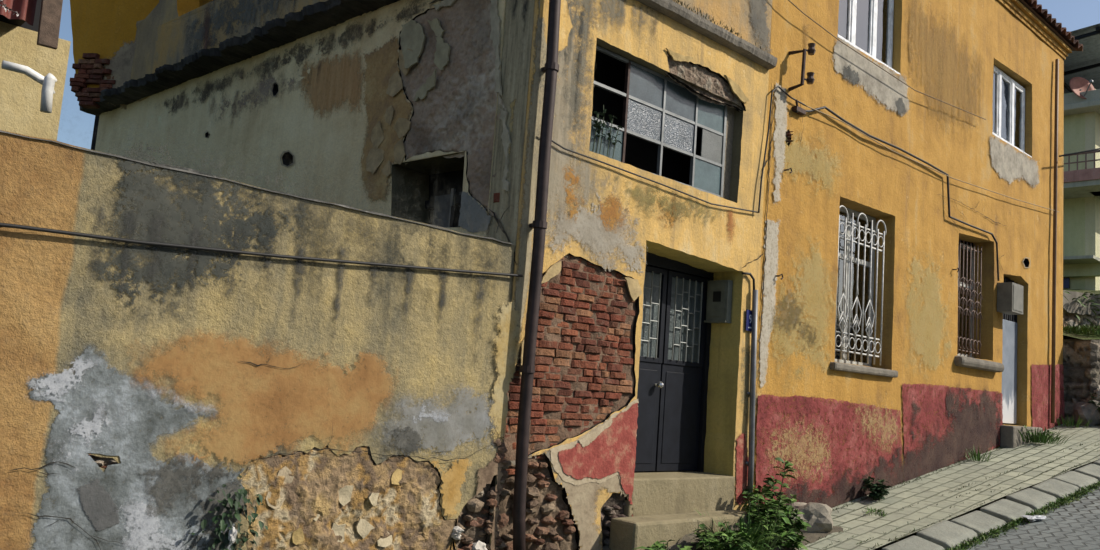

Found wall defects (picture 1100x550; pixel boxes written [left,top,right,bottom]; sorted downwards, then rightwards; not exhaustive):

leakage [164,0,424,119]
leakage [92,138,346,319]
leakage [348,213,414,309]
leakage [428,240,447,317]
flaking render [240,0,642,550]
flaking render [89,454,117,469]
peeling [736,431,748,505]
peeling [771,423,831,479]